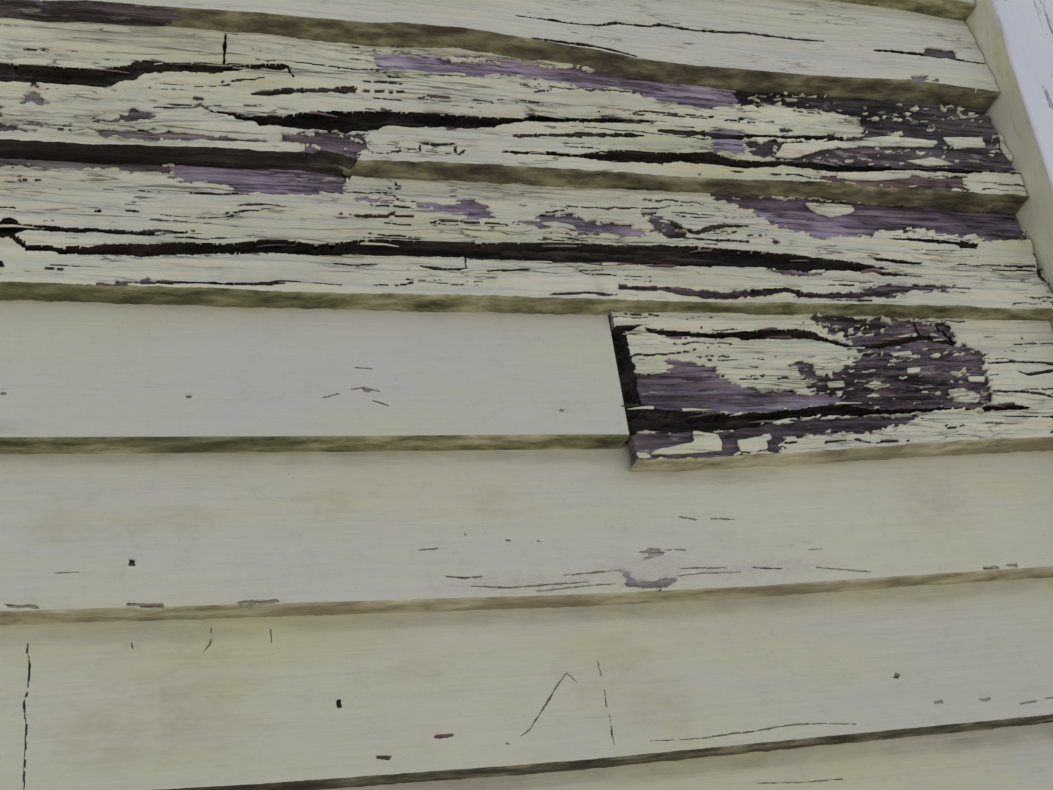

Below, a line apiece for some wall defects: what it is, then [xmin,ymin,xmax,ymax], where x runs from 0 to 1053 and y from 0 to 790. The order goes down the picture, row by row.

crack [516,15,824,57]
peeling [924,48,956,60]
peeling [93,108,267,142]
peeling [281,132,368,159]
peeling [371,50,1016,193]
peeling [0,158,495,220]
crack [0,24,1053,380]
peeling [517,194,1027,244]
peeling [860,284,959,299]
peeling [634,315,992,460]
crack [22,643,31,788]
crack [597,660,615,745]